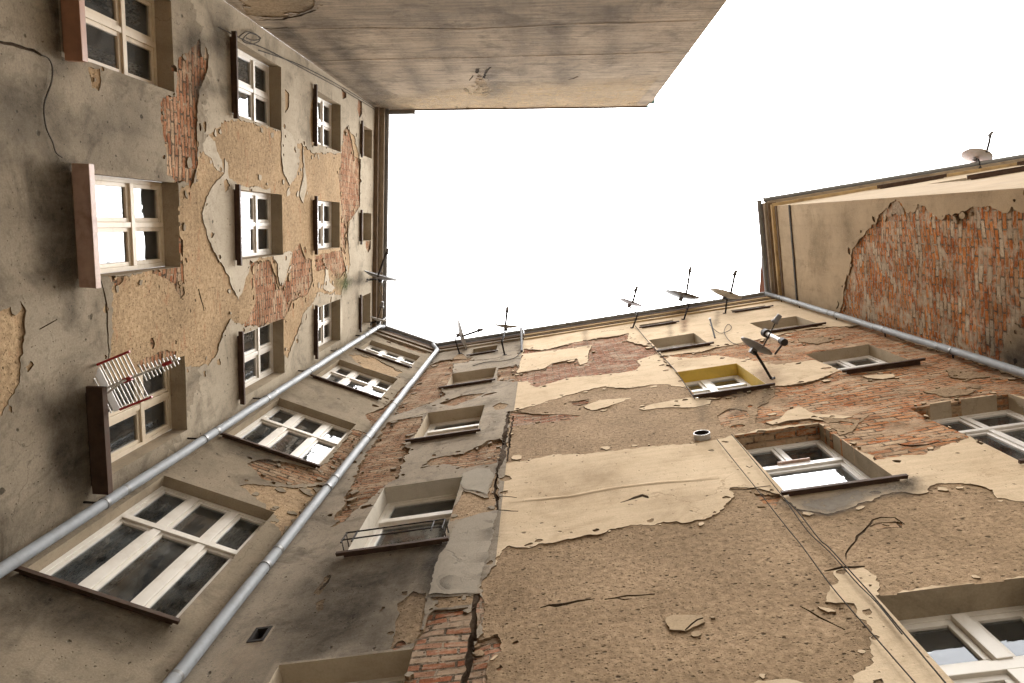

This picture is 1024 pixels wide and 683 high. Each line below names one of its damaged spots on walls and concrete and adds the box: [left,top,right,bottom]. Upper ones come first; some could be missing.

crack [0,41,41,56]
peeling [100,39,362,380]
peeling [0,301,34,416]
flaking render [240,191,1024,536]
crack [493,411,517,511]
crack [460,594,480,683]
peeling [379,483,1024,683]